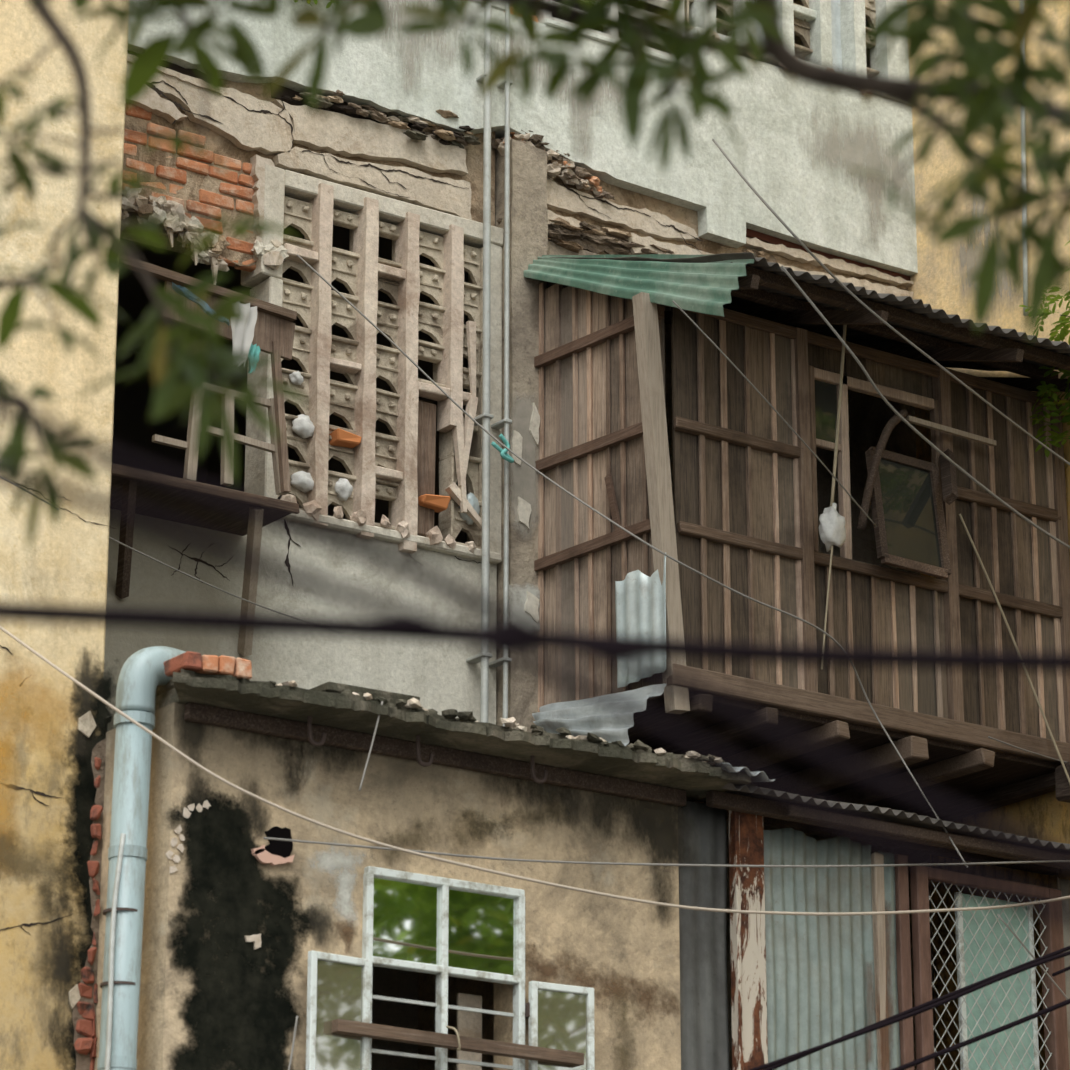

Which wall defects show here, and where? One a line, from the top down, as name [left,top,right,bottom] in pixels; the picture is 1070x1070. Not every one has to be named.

crack [150,80,469,198]
flaking render [121,87,289,274]
crack [169,545,230,581]
water stain [181,714,206,761]
water stain [244,731,363,791]
crack [2,783,62,806]
spalling [251,826,295,866]
spalling [68,711,106,1070]
crack [0,914,72,934]
water stain [167,774,361,1070]